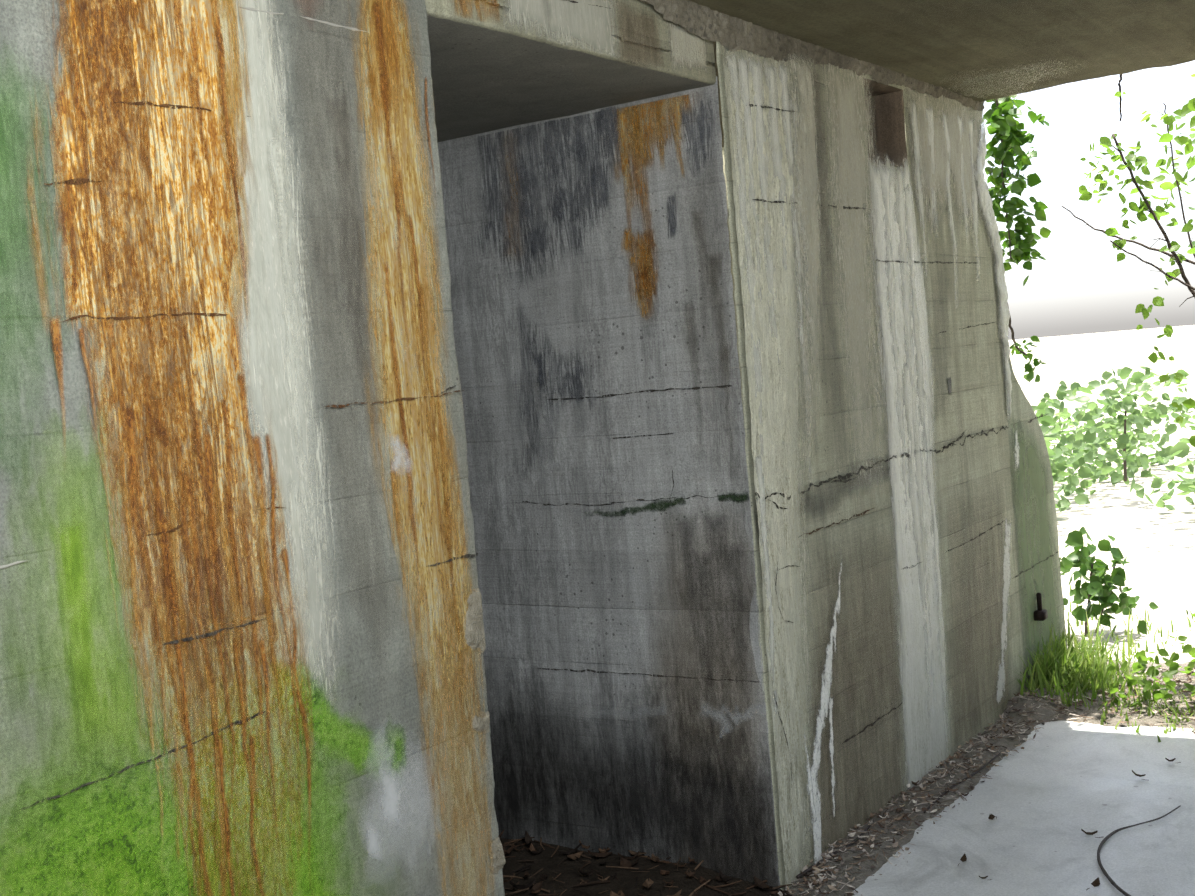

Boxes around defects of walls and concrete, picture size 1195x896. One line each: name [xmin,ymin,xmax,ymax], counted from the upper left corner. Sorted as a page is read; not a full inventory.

water stain [506,0,706,71]
spalling [641,0,985,111]
corrosion [612,94,694,317]
water stain [217,0,337,713]
corrosion [50,0,311,896]
corrosion [356,0,496,896]
water stain [490,50,1045,891]
crack [513,414,1048,517]
crack [775,508,874,623]
crack [903,520,1005,569]
water stain [382,771,399,821]